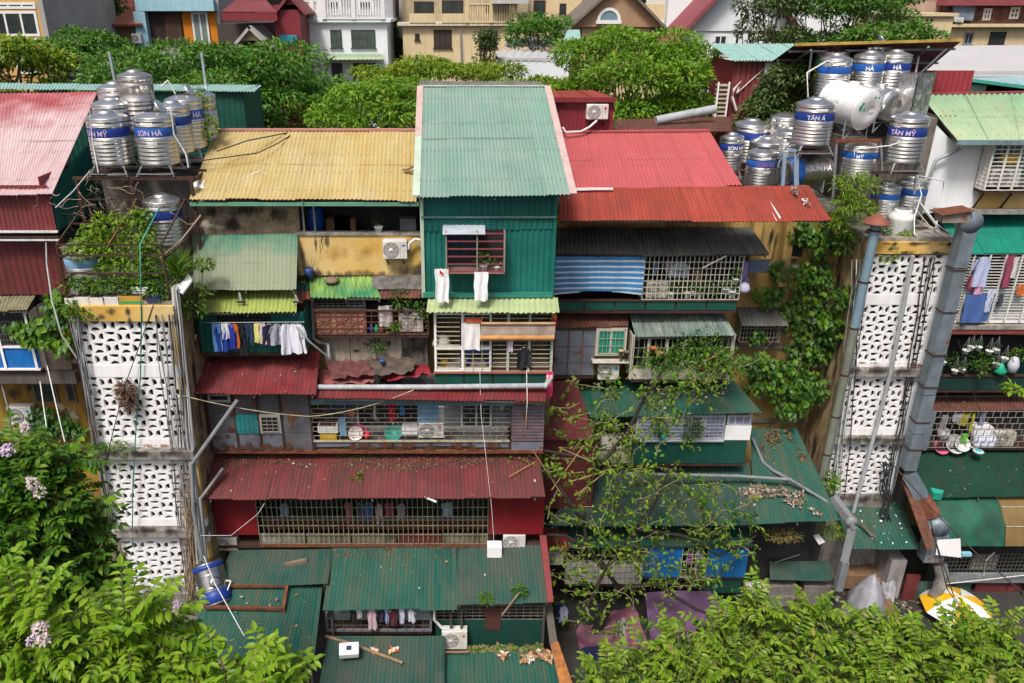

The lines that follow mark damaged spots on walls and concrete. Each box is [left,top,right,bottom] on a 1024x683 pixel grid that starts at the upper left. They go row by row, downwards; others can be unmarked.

damp [199,208,215,219]
damp [227,206,254,230]
damp [398,264,421,275]